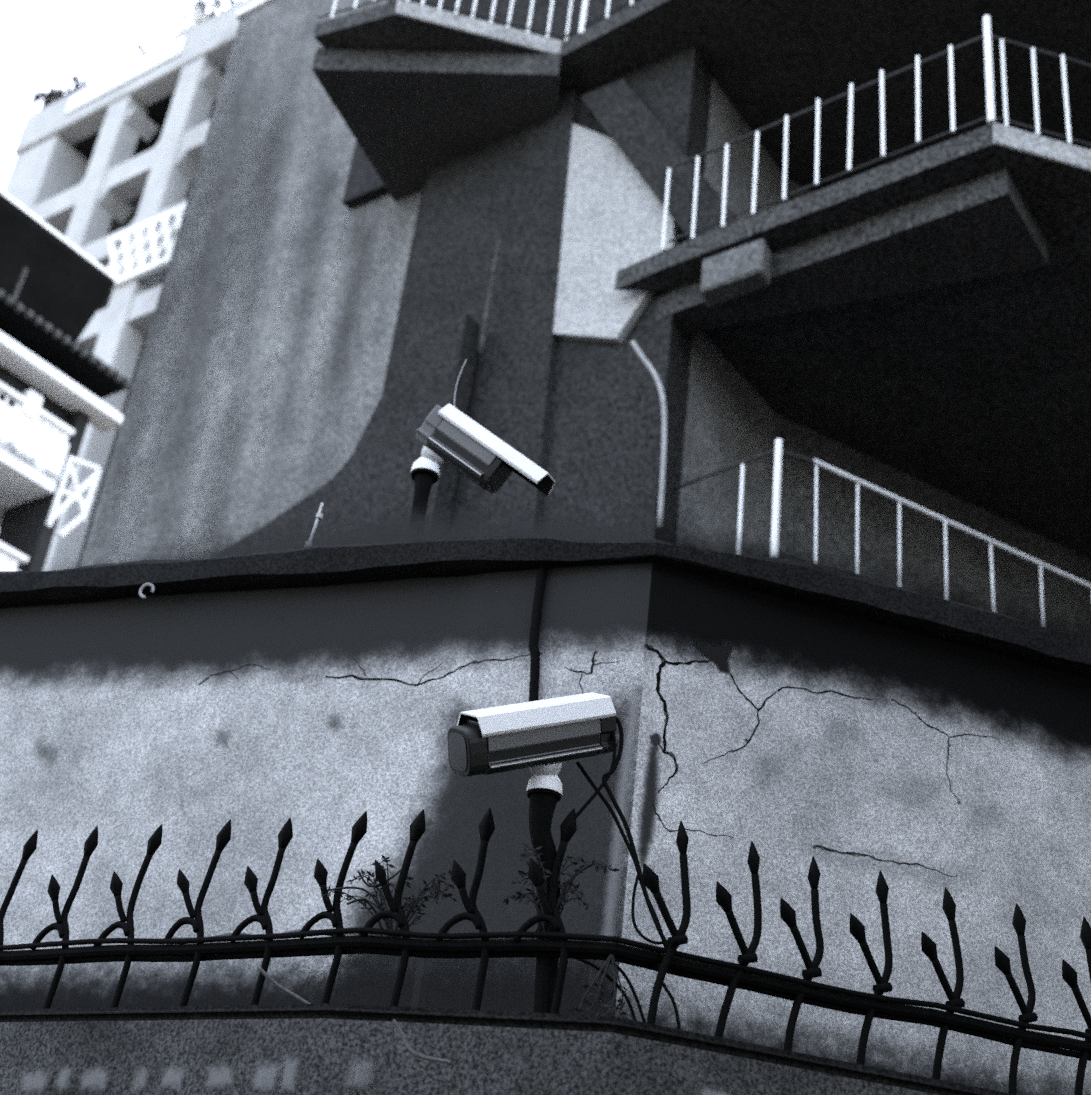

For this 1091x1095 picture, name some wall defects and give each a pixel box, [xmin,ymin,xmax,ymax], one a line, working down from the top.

crack [325,653,541,686]
crack [564,650,618,694]
crack [644,644,997,838]
crack [813,845,955,877]